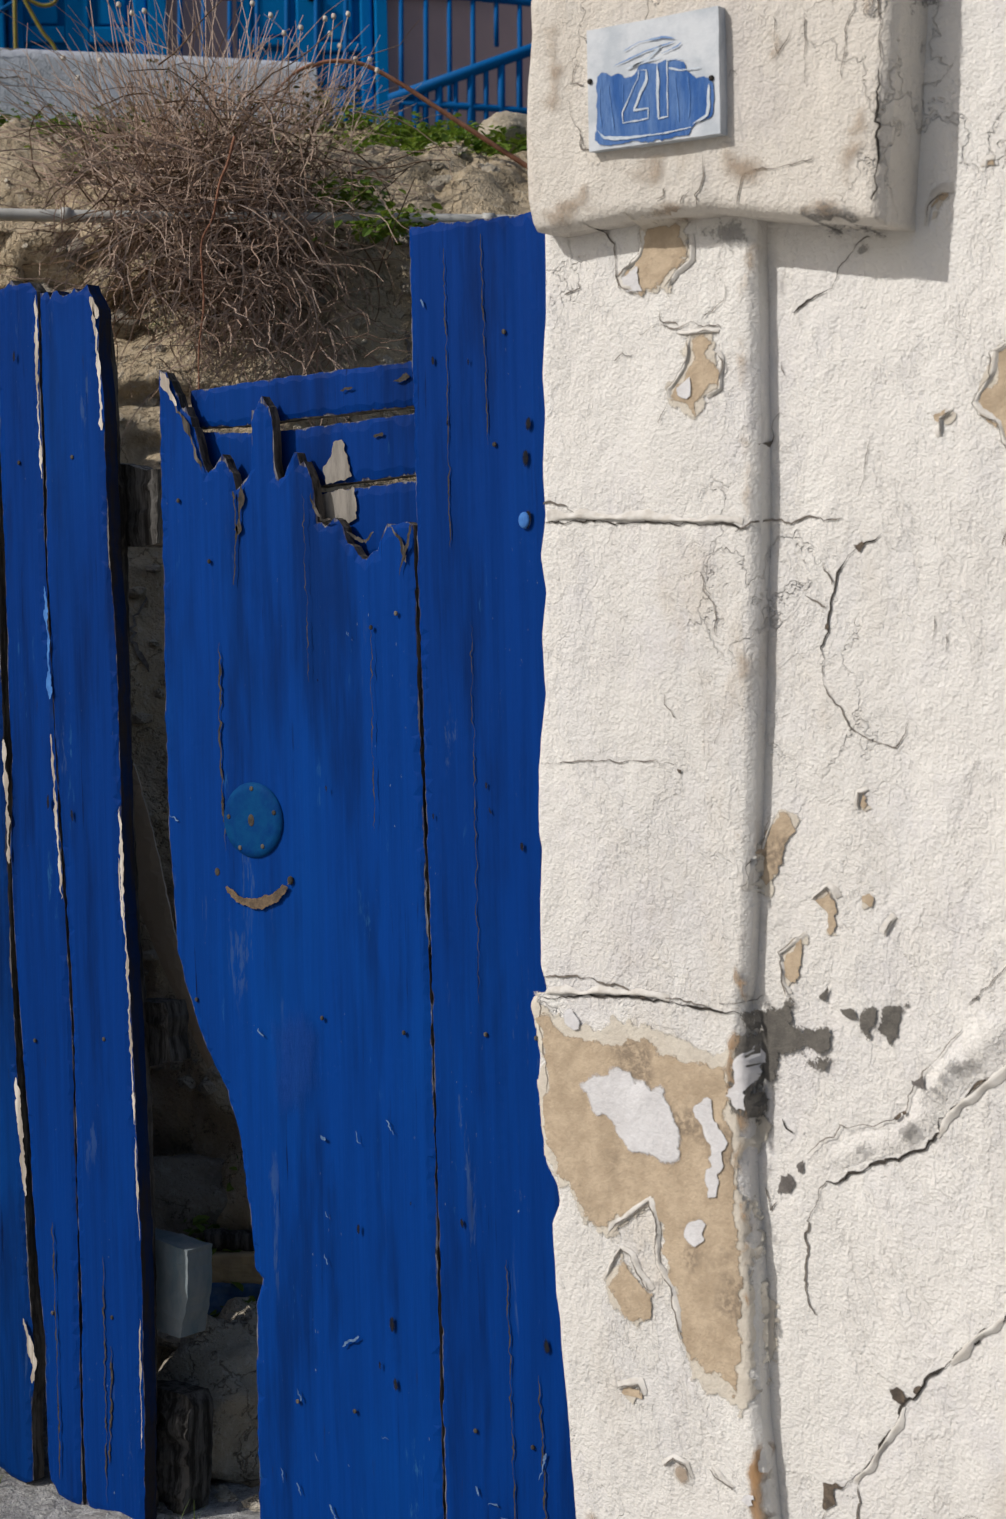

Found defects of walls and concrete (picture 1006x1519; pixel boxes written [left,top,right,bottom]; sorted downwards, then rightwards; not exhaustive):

crack [0,48,28,79]
crack [773,0,882,200]
peeling [616,209,695,296]
crack [792,236,870,313]
peeling [665,327,724,420]
peeling [972,340,1006,448]
crack [543,436,908,748]
crack [542,759,681,774]
peeling [741,809,800,897]
peeling [819,987,909,1047]
peeling [531,881,842,1418]
crack [765,967,1006,1315]